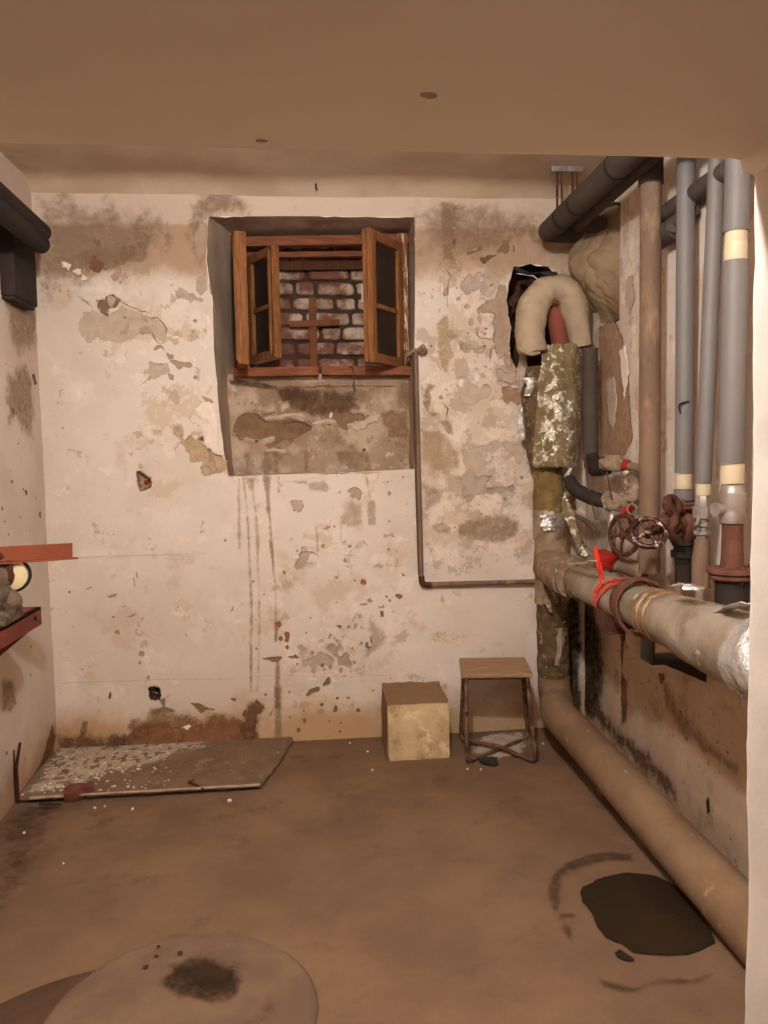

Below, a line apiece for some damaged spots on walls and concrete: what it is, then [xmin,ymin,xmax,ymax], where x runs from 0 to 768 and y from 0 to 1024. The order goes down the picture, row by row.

peeling [61,240,212,383]
crack [122,302,167,385]
peeling [174,396,227,476]
leakage [236,452,278,512]
spalling [450,240,558,406]
peeling [597,321,632,457]
corrosion [123,703,256,745]
leakage [230,661,281,739]
peeling [262,594,403,733]
leakage [569,598,676,800]
leakage [641,673,737,770]
leakage [550,853,629,917]